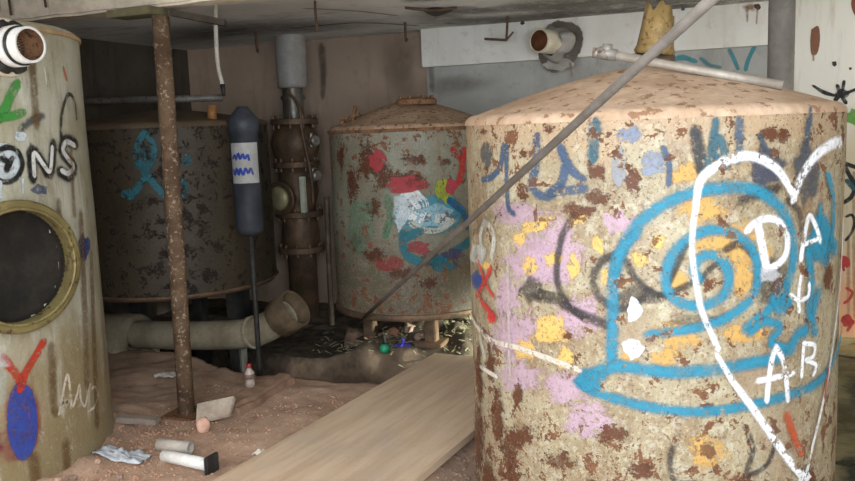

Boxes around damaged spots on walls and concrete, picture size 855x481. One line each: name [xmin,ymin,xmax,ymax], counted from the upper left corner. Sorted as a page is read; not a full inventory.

corrosion [756,124,791,144]
corrosion [337,128,430,222]
corrosion [515,178,529,203]
corrosion [563,160,611,220]
corrosion [623,163,642,197]
corrosion [386,251,448,292]
corrosion [823,258,833,299]
corrosion [473,336,540,481]
corrosion [594,424,629,444]
corrosion [538,450,580,470]
corrosion [627,463,654,480]